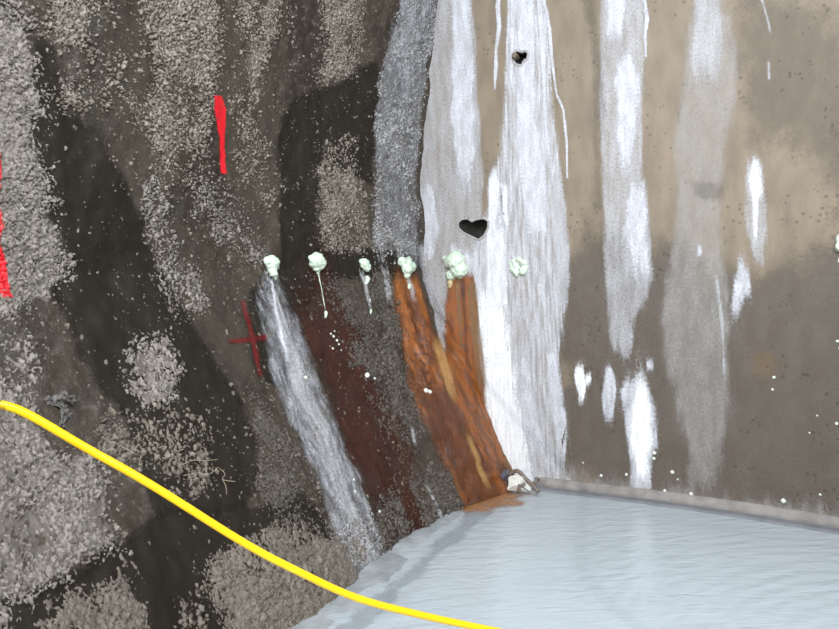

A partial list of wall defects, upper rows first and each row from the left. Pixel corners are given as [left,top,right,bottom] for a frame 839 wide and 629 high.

leakage [29,38,335,552]
rust [299,259,429,539]
rust [393,274,523,513]
leakage [211,0,839,575]
leakage [0,488,268,629]